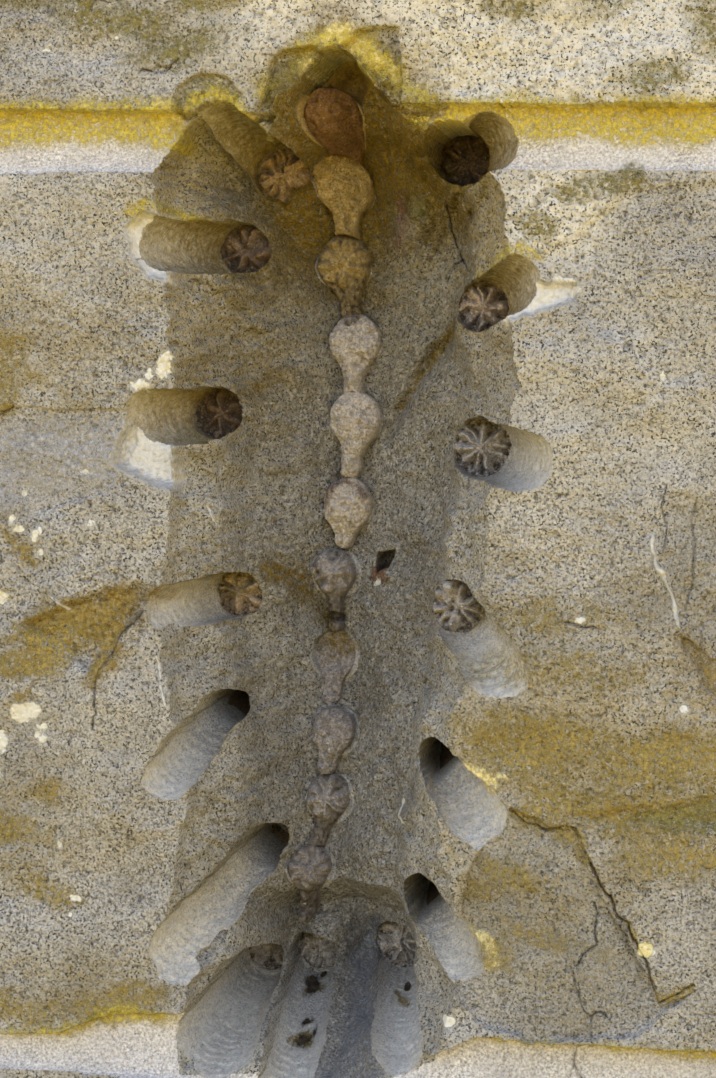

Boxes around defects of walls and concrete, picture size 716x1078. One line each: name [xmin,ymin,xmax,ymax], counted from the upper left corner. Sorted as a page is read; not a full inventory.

leakage [3,514,44,563]
leakage [7,690,48,743]
leakage [0,730,9,754]
leakage [20,875,82,917]
crack [576,830,694,994]
leakage [0,982,163,1029]